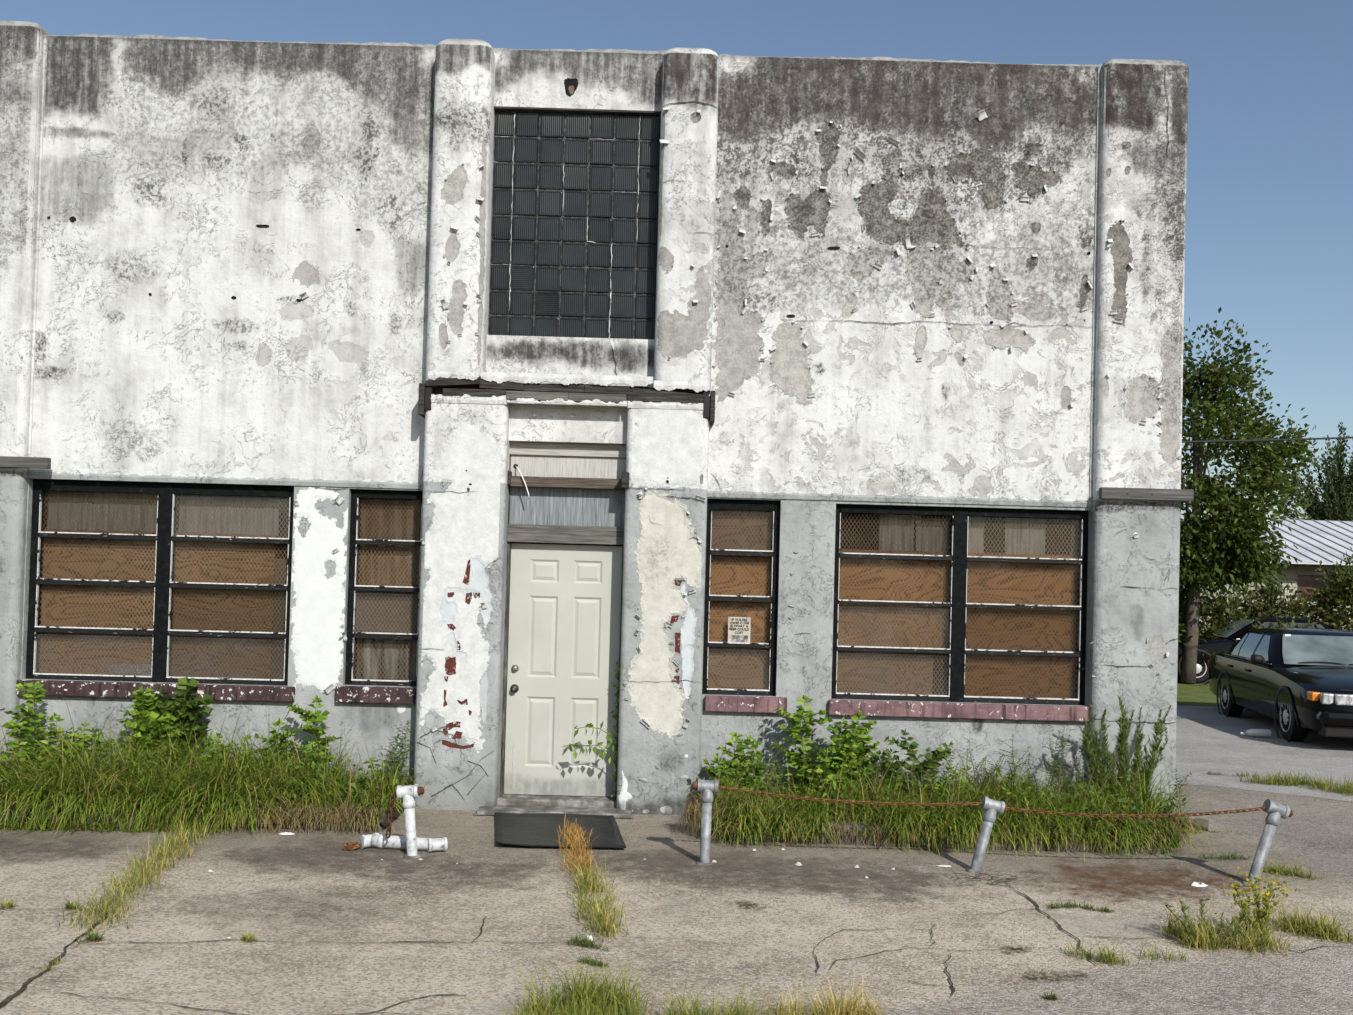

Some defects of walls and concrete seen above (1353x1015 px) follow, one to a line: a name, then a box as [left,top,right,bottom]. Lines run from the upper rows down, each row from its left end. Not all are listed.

damp [0,25,112,114]
damp [128,38,1189,317]
peeling [1106,217,1134,326]
damp [488,340,654,376]
peeling [428,107,1063,740]
peeling [1101,321,1183,464]
peeling [290,486,348,694]
peeling [397,422,505,761]
crack [0,904,308,1015]
crack [336,994,466,1015]
crack [471,917,549,943]
crack [813,883,1175,996]